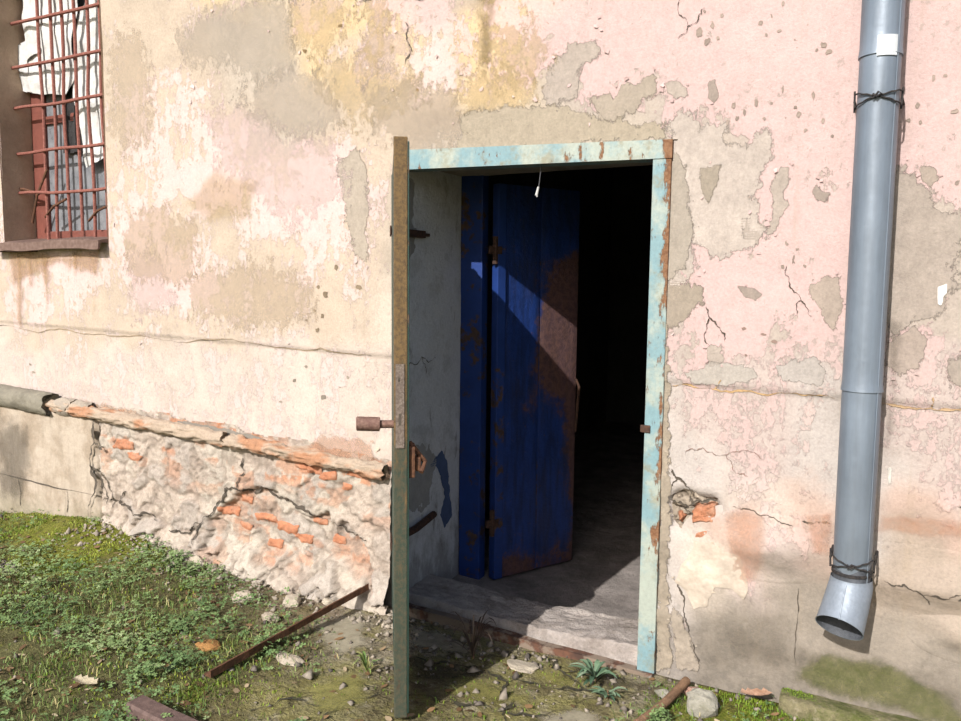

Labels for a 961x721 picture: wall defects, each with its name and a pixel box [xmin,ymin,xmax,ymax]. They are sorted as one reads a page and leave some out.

peeling [334,149,372,269]
peeling [884,156,961,380]
crack [0,325,157,339]
crack [184,338,364,355]
peeling [452,16,806,675]
crack [704,308,725,344]
peeling [947,349,961,388]
crack [0,420,366,544]
spalling [44,397,392,615]
peeling [409,443,436,513]
crack [670,448,830,527]
crack [887,582,961,605]